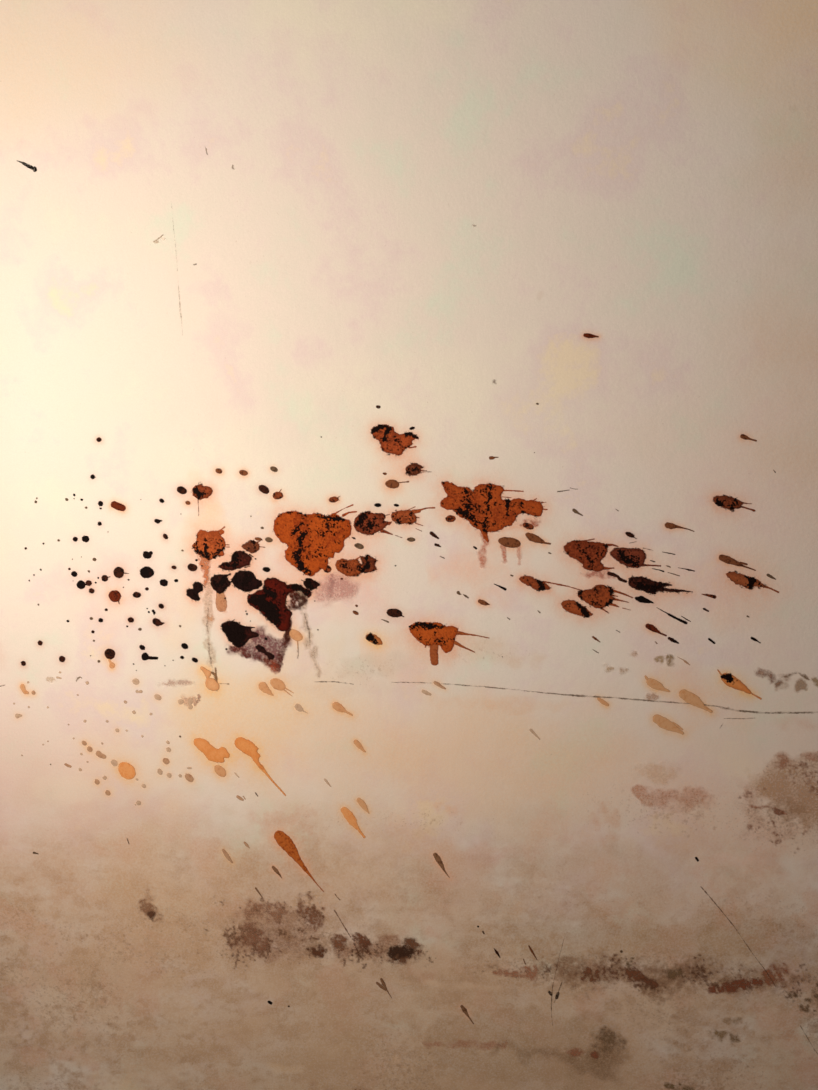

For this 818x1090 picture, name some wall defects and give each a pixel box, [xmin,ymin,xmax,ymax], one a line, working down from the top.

damp [224,894,430,965]
damp [493,955,659,993]
damp [668,955,795,993]